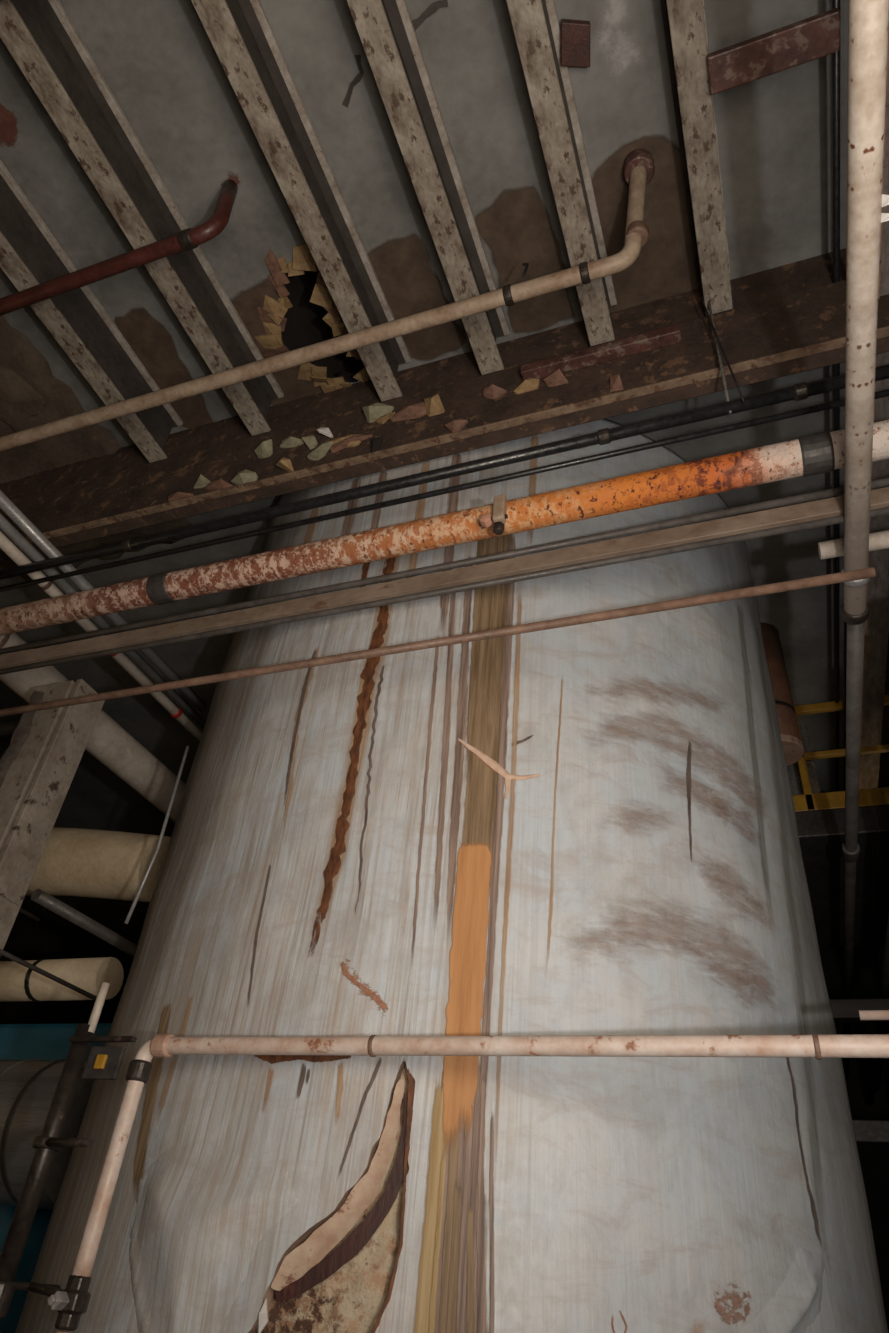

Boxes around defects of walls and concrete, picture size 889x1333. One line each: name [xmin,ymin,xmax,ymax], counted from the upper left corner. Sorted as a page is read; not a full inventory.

peeling [0,315,122,484]
spalling [255,244,370,393]
peeling [168,394,468,502]
leakage [368,234,450,320]
leakage [402,320,466,360]
leakage [476,187,567,289]
peeling [483,369,569,399]
leakage [592,136,702,313]
rust [412,582,522,1036]
rust [255,1055,351,1117]
rust [414,1056,501,1333]
rust [715,1284,751,1325]